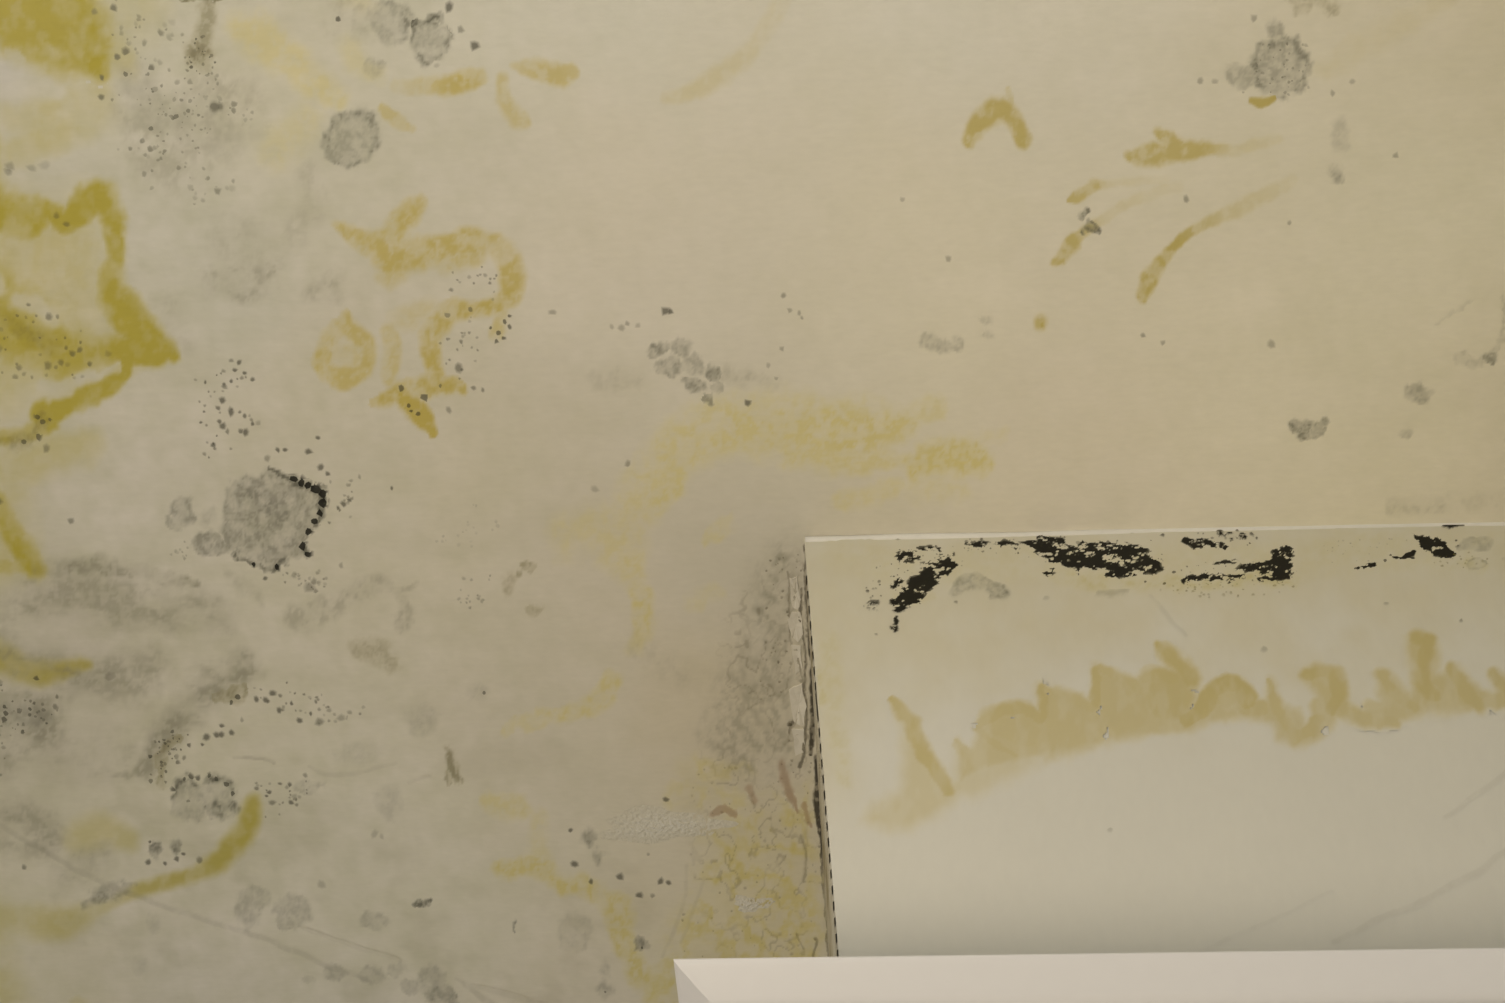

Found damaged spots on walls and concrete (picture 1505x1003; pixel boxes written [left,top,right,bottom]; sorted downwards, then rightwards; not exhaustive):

leakage [960,85,1036,154]
leakage [0,0,581,578]
leakage [1049,123,1286,268]
leakage [1134,172,1300,306]
leakage [456,315,1012,635]
leakage [1287,414,1331,443]
leakage [164,435,421,677]
leakage [815,525,1505,636]
leakage [0,640,386,1003]
leakage [401,698,466,787]
leakage [477,625,1505,1003]
leakage [301,957,461,1003]